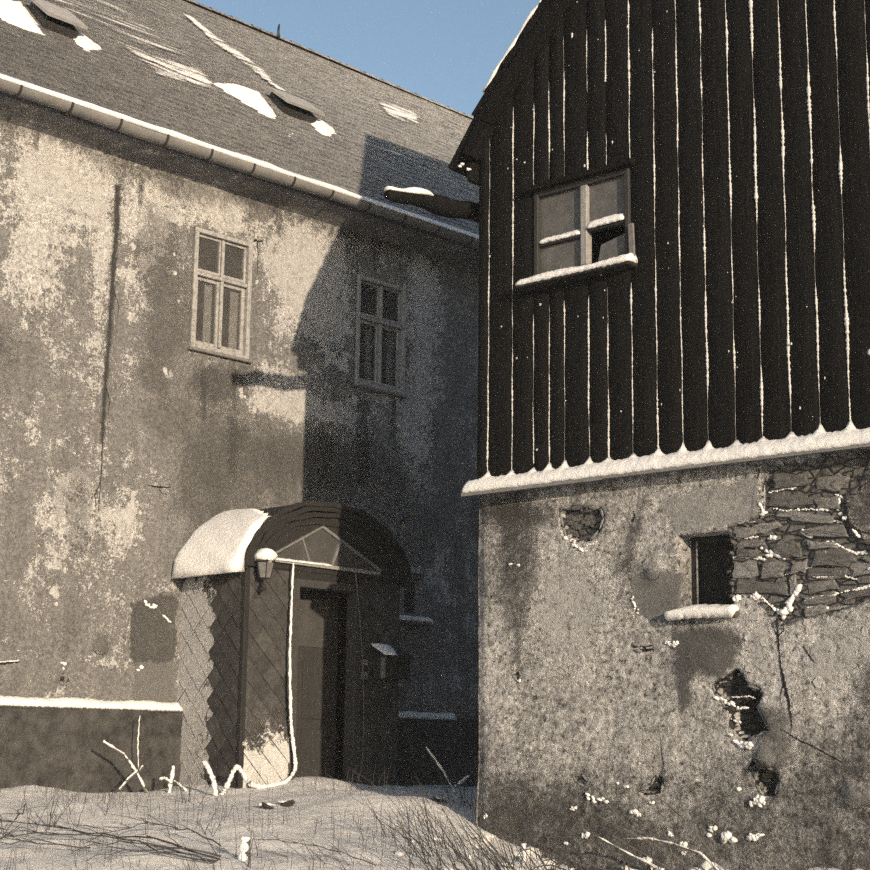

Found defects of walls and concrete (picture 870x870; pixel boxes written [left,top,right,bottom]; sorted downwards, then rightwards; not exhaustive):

crack [94,185,121,512]
peeling [525,503,605,667]
water stain [673,628,742,711]
spalling [712,452,870,741]
crack [773,621,843,763]
spalling [749,758,779,797]